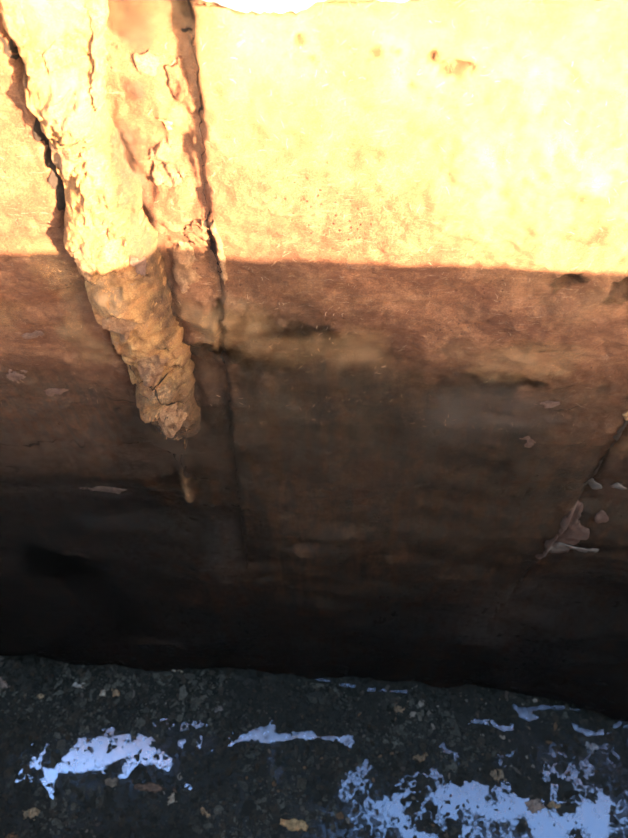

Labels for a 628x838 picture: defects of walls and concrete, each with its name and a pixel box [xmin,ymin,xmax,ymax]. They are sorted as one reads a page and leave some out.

crack [0,37,20,60]
crack [33,117,89,211]
crack [181,0,249,554]
crack [129,365,178,406]
peeling [585,478,627,490]
peeling [535,501,609,559]